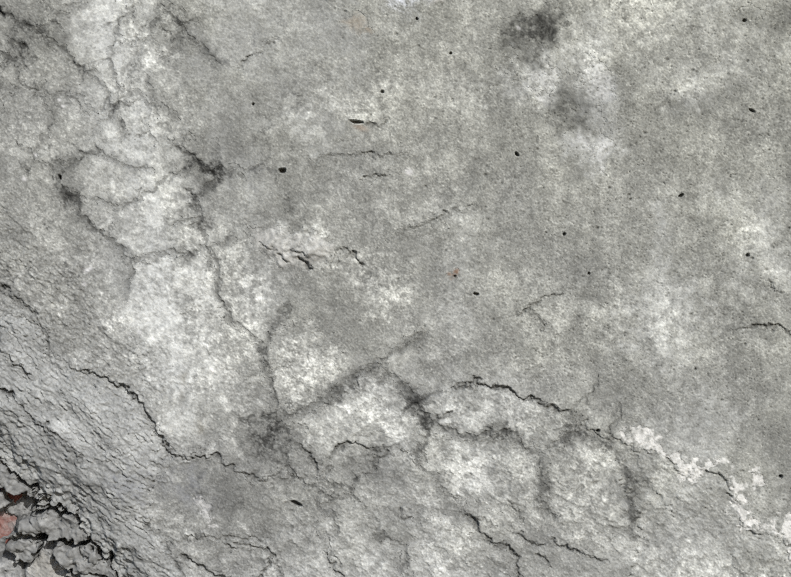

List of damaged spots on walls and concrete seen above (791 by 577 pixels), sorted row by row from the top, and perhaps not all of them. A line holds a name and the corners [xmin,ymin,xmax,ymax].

crack [306,150,410,183]
crack [0,0,297,411]
crack [329,246,365,270]
crack [514,293,563,331]
crack [729,323,791,337]
crack [0,348,117,468]
crack [77,331,659,577]
leakage [619,425,718,479]
leakage [752,466,765,490]
spalling [0,458,118,577]
leakage [730,494,760,530]
leakage [781,512,791,561]